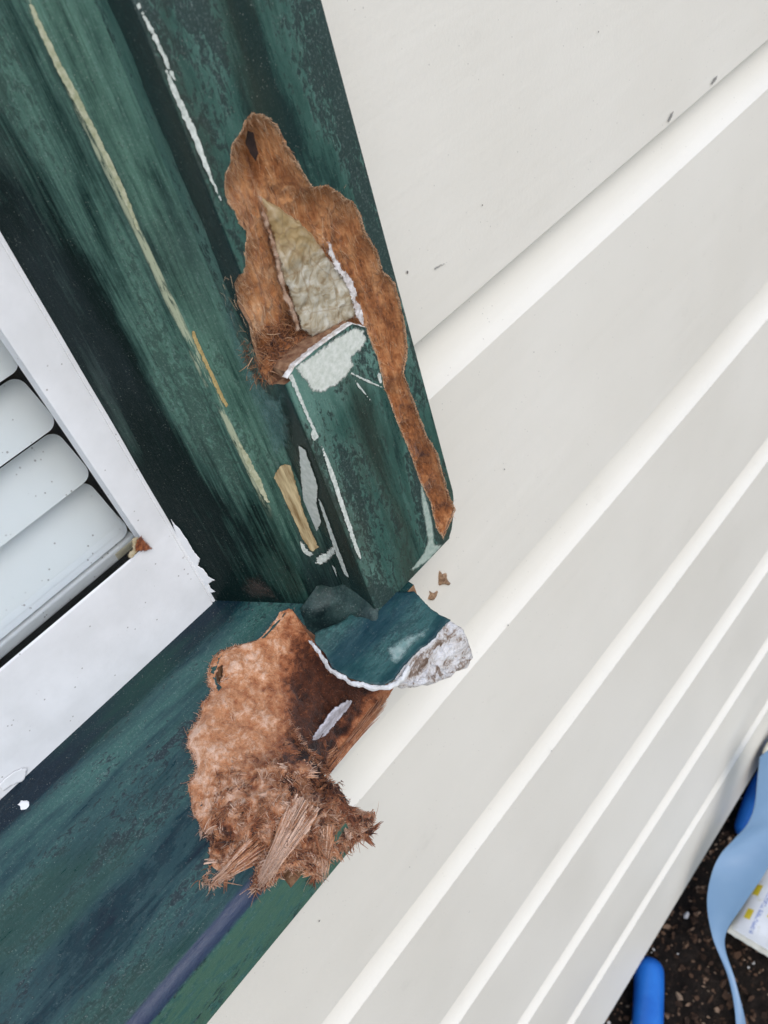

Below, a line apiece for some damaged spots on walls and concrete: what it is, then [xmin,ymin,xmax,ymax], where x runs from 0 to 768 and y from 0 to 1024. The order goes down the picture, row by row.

peeling [259,197,300,331]
peeling [238,238,366,577]
peeling [413,487,440,570]